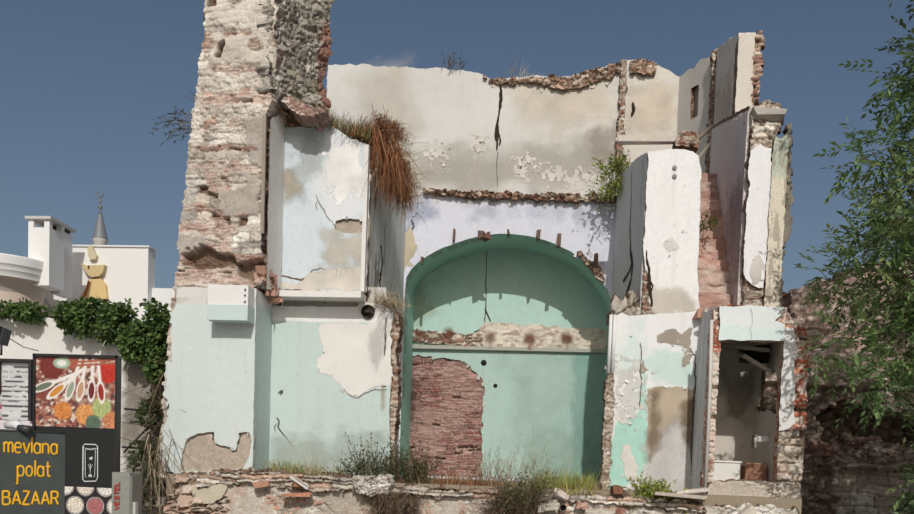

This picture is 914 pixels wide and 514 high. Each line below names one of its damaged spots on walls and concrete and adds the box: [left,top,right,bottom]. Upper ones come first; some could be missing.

peeling [322,139,371,206]
crack [494,85,503,186]
spalling [423,150,617,209]
flaking render [333,215,371,238]
crack [474,253,491,332]
peeling [316,320,393,397]
flaking render [657,327,693,367]
flaking render [181,432,255,472]
flaking render [409,322,607,478]
peeling [610,444,639,495]
peeling [603,354,695,459]
leakage [632,392,694,492]